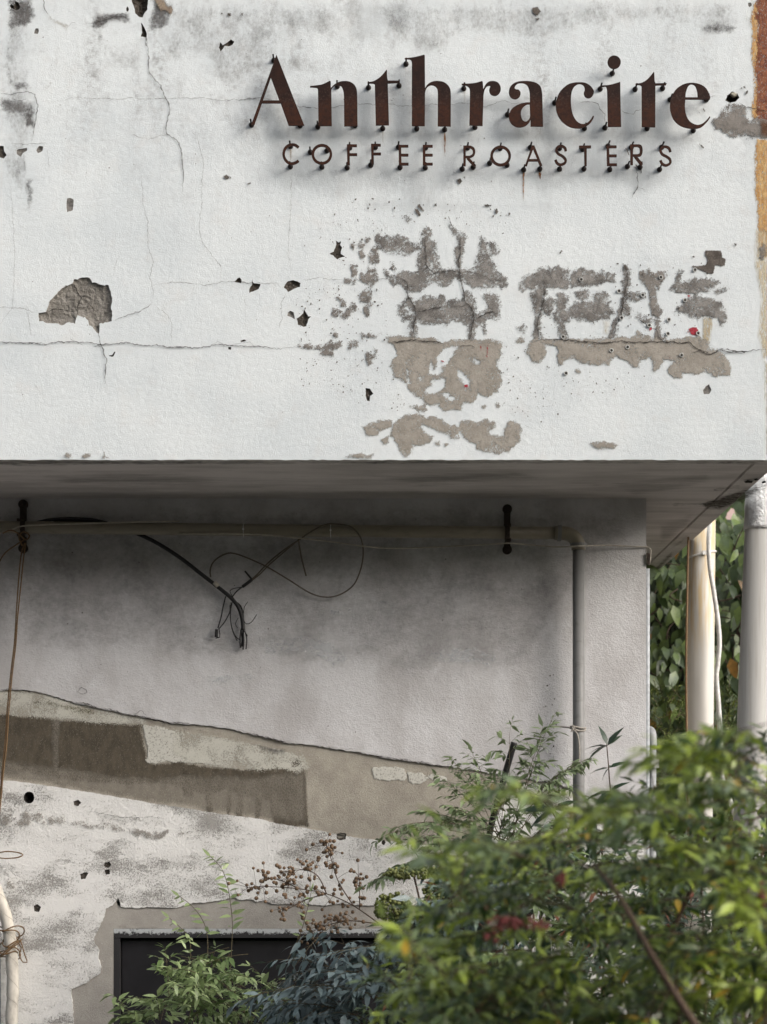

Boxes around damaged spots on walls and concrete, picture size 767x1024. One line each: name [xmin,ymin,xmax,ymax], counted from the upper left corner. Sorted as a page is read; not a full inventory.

crack [145,38,184,191]
peeling [703,86,767,138]
corrosion [750,0,767,356]
crack [50,284,85,315]
spalling [38,277,112,333]
crack [1,305,299,383]
crack [373,216,505,347]
peeling [299,204,731,457]
crack [529,267,764,355]
spalling [0,690,573,850]
spalling [71,892,421,1024]